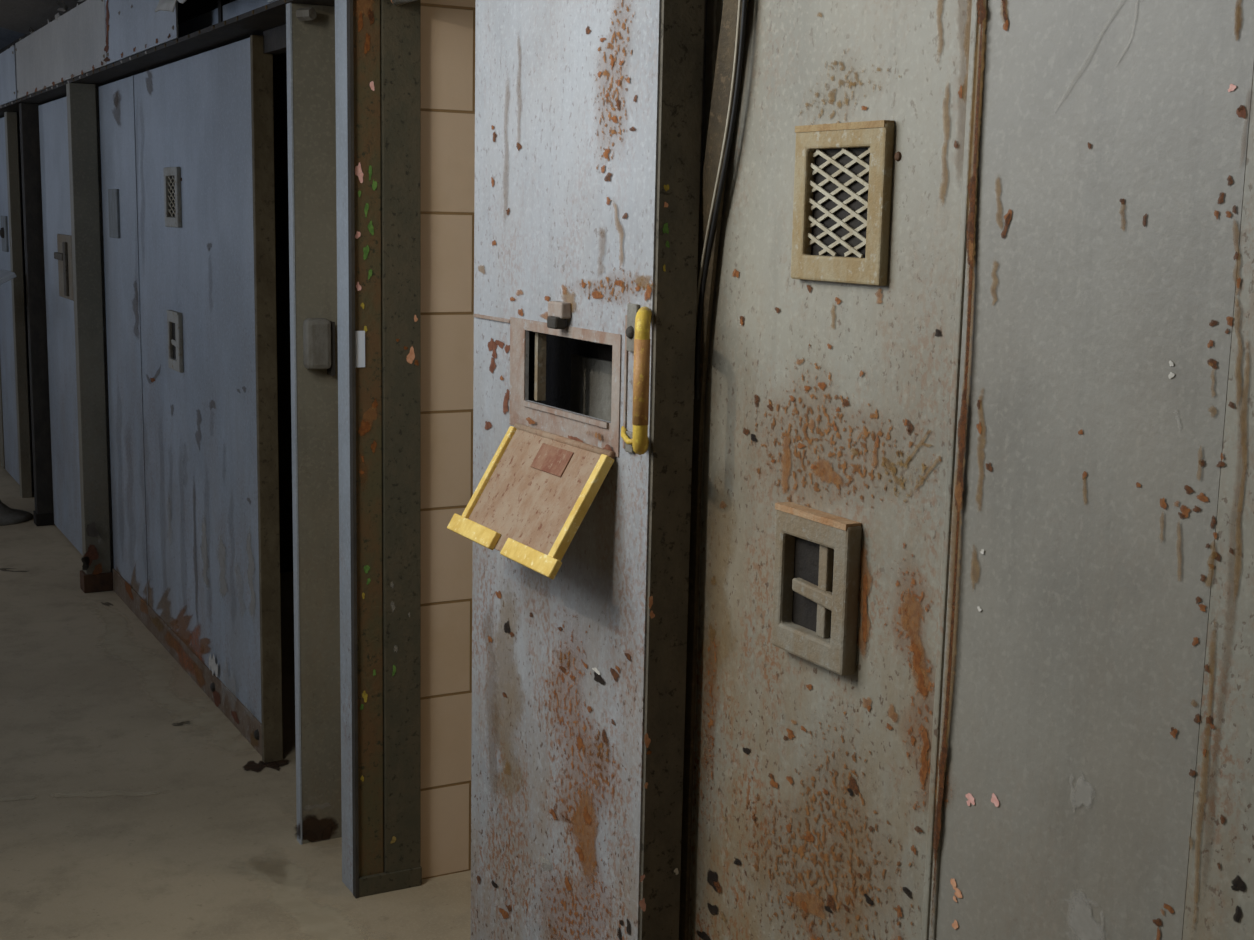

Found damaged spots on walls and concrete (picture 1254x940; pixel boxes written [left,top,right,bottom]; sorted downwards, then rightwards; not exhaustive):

corrosion [586,0,637,182]
corrosion [1001,209,1012,238]
corrosion [1214,175,1236,219]
corrosion [541,267,653,319]
corrosion [1207,316,1233,369]
corrosion [737,0,986,940]
corrosion [81,523,102,575]
corrosion [1160,485,1234,582]
corrosion [165,606,239,724]
corrosion [533,609,631,940]
corrosion [1231,875,1246,891]
corrosion [1153,903,1174,940]